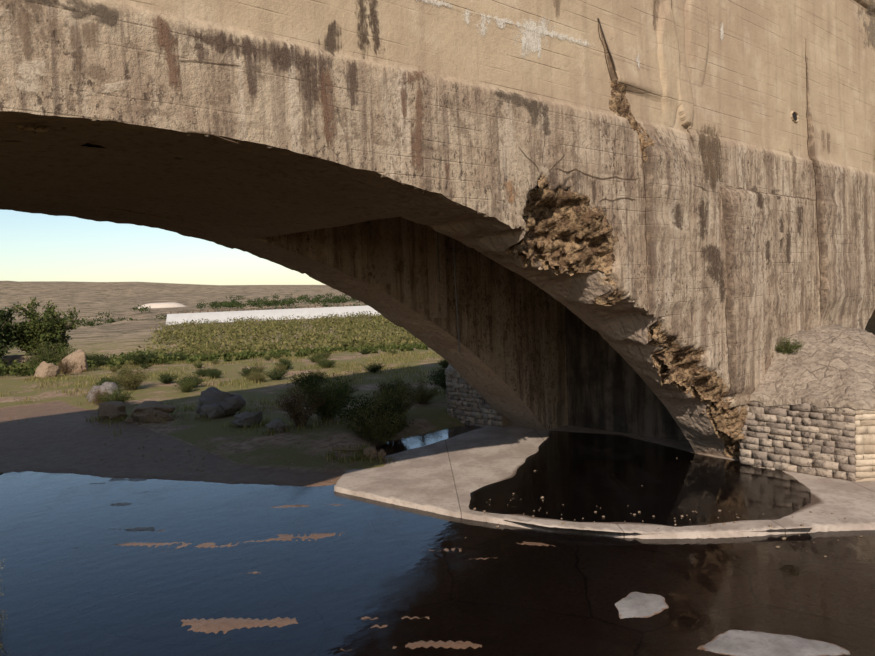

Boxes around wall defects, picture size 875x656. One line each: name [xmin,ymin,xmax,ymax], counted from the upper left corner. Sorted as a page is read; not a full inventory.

damp [19,0,118,58]
damp [188,20,342,112]
damp [346,0,380,109]
damp [464,10,589,58]
crack [597,0,672,102]
damp [691,124,724,187]
spalling [505,175,635,305]
crack [518,76,822,416]
damp [699,198,730,301]
damp [766,206,803,265]
spalling [650,320,748,457]